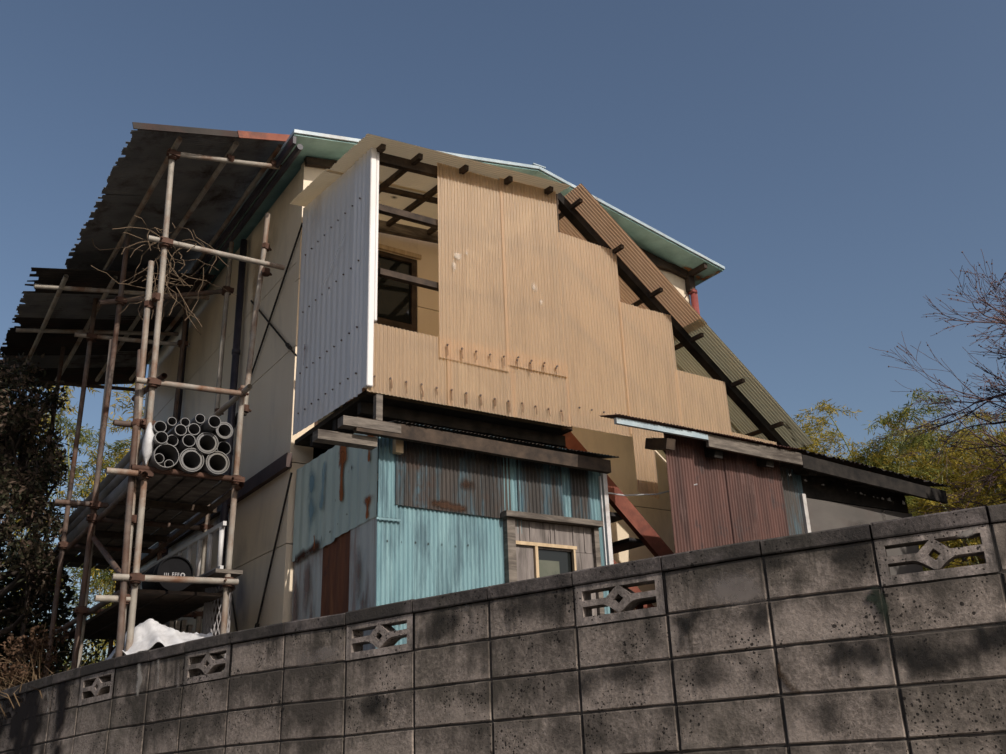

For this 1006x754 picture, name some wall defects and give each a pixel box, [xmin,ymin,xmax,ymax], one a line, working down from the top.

corrosion [339,446,347,501]
damp [715,578,768,627]
damp [830,641,877,664]
damp [897,622,1006,671]
damp [47,681,69,754]